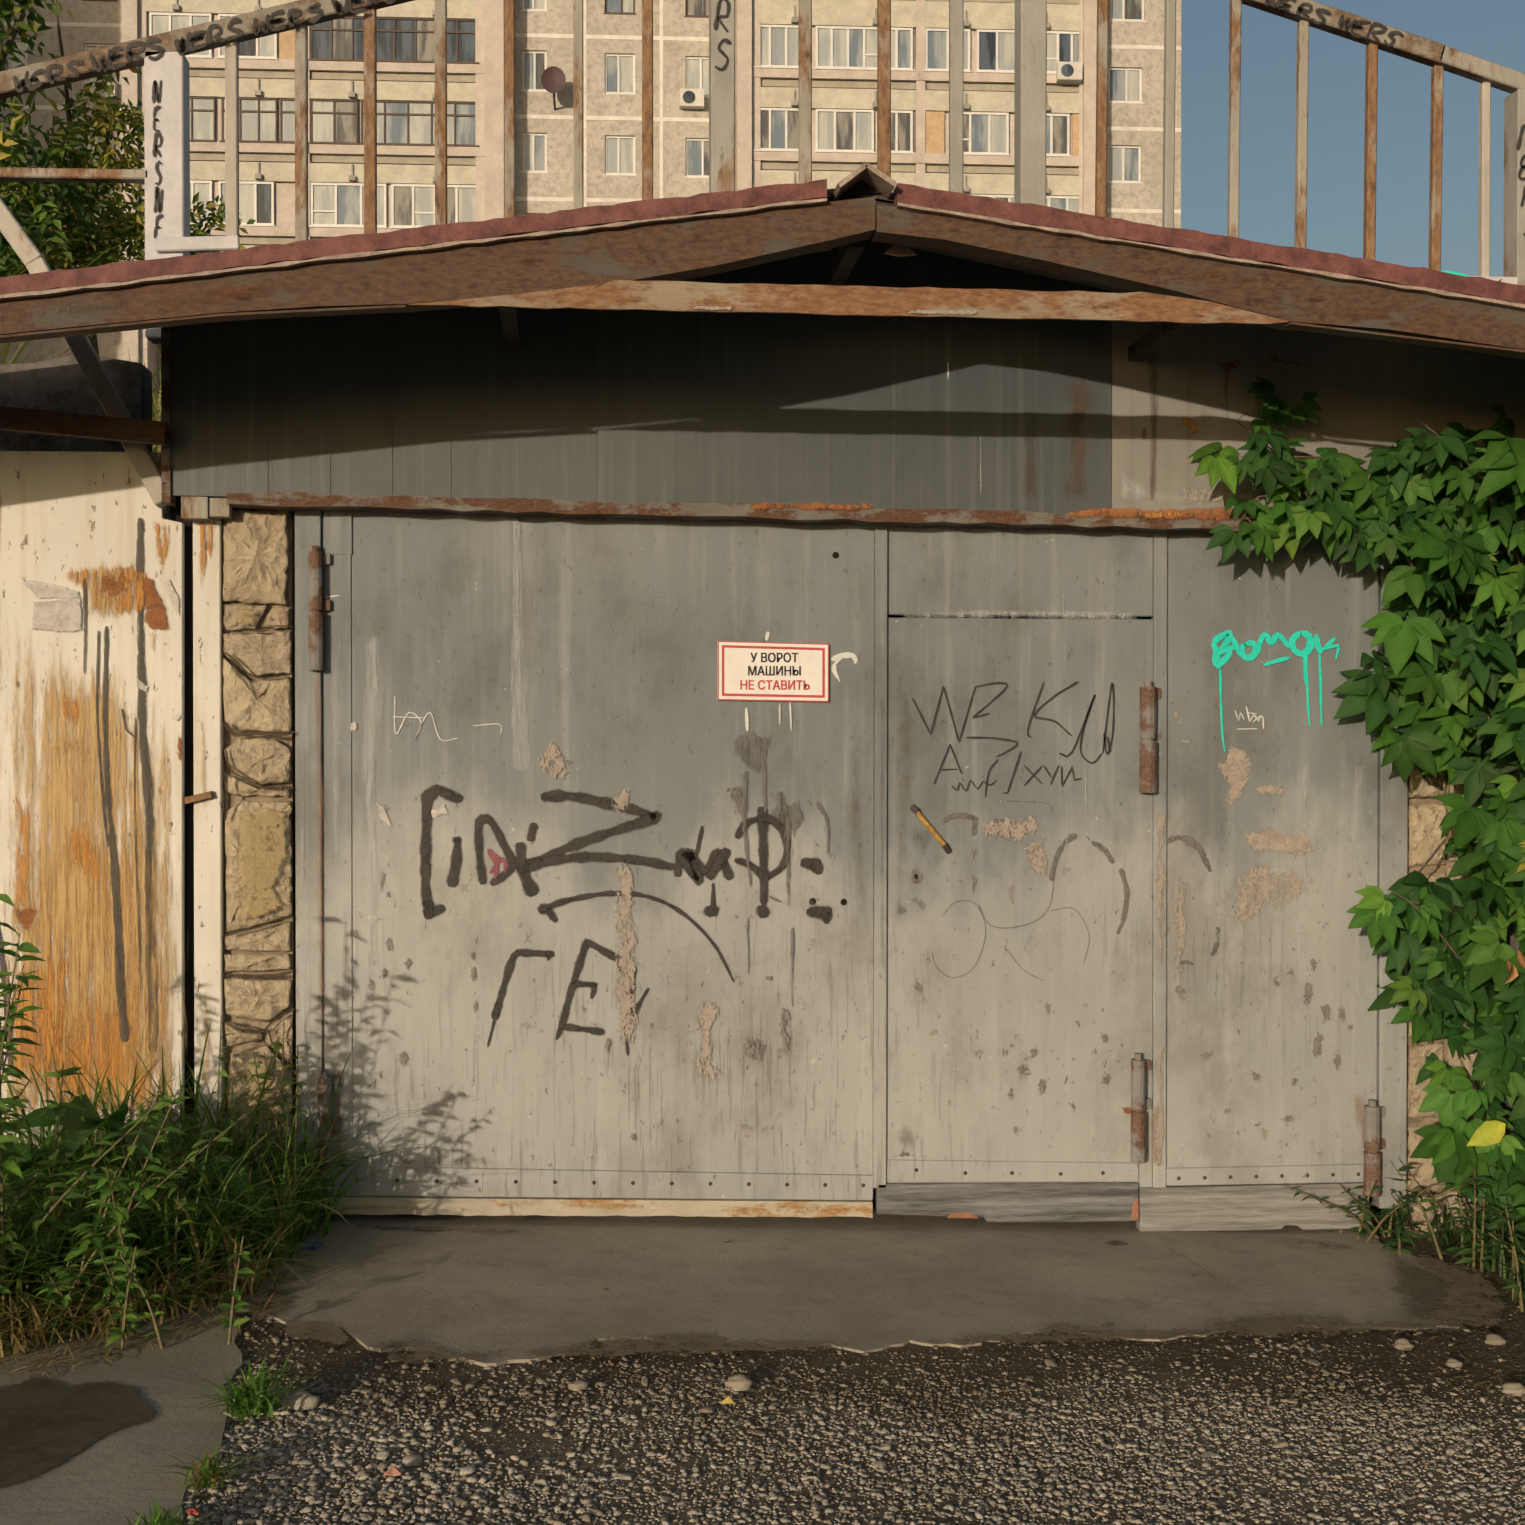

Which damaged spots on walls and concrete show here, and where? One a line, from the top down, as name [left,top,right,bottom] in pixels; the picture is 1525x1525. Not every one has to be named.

corrosion [66,523,169,648]
corrosion [199,521,214,576]
corrosion [750,502,874,511]
peeling [538,742,568,780]
peeling [610,787,633,816]
peeling [1218,743,1285,809]
corrosion [2,642,183,1120]
peeling [1226,826,1319,929]
peeling [605,862,640,1054]
peeling [741,928,794,1067]